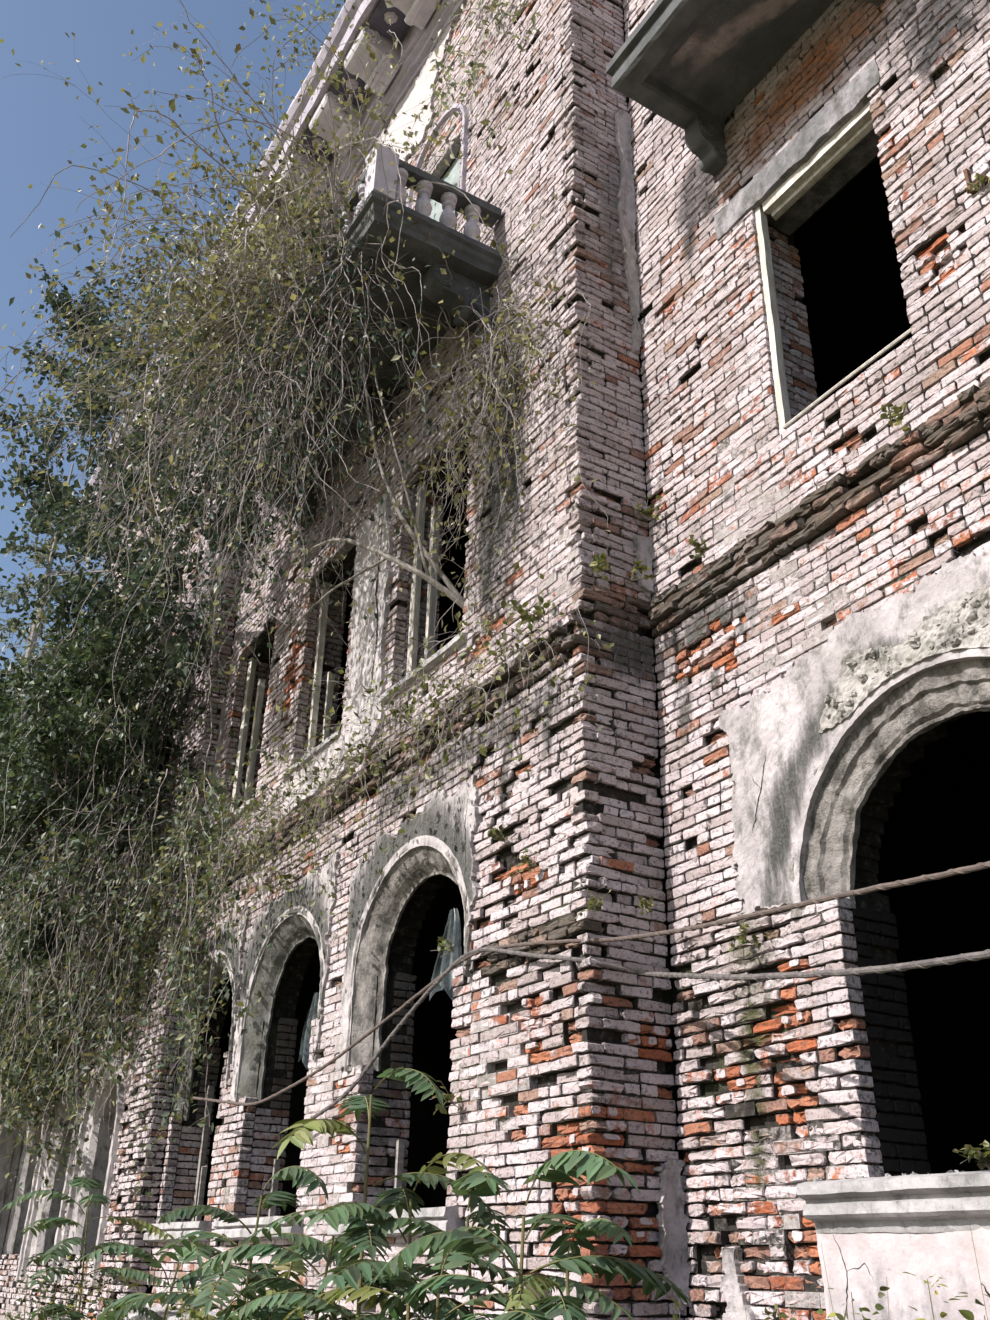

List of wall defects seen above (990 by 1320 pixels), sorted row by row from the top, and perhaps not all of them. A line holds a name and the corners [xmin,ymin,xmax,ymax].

spalling [818,585,990,733]
damp [345,674,559,966]
damp [762,690,833,907]
damp [184,881,328,1011]